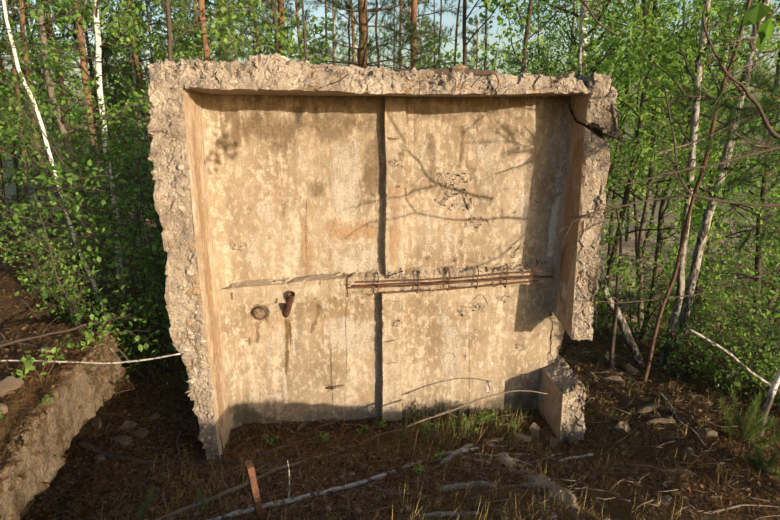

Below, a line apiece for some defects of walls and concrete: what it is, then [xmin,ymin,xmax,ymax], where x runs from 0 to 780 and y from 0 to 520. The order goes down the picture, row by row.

spalling [434,170,501,231]
corrosion [284,320,292,374]